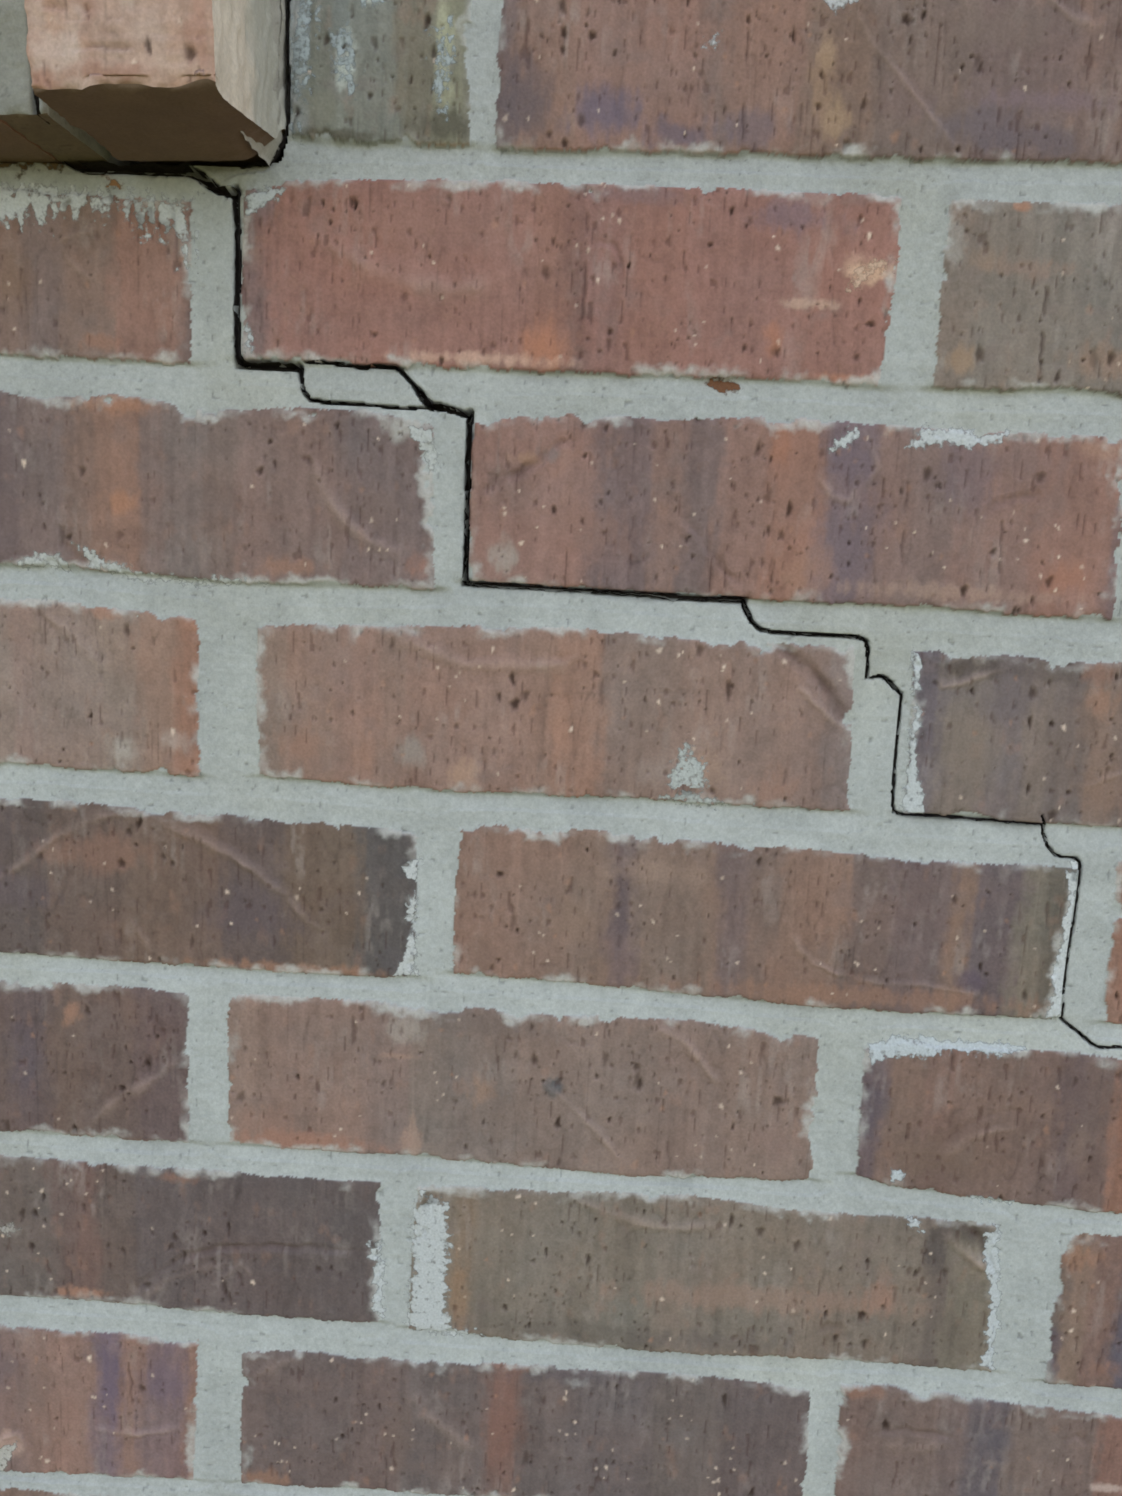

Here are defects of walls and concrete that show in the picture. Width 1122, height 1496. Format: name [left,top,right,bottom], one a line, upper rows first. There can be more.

crack [33,91,50,124]
crack [65,0,1122,1049]